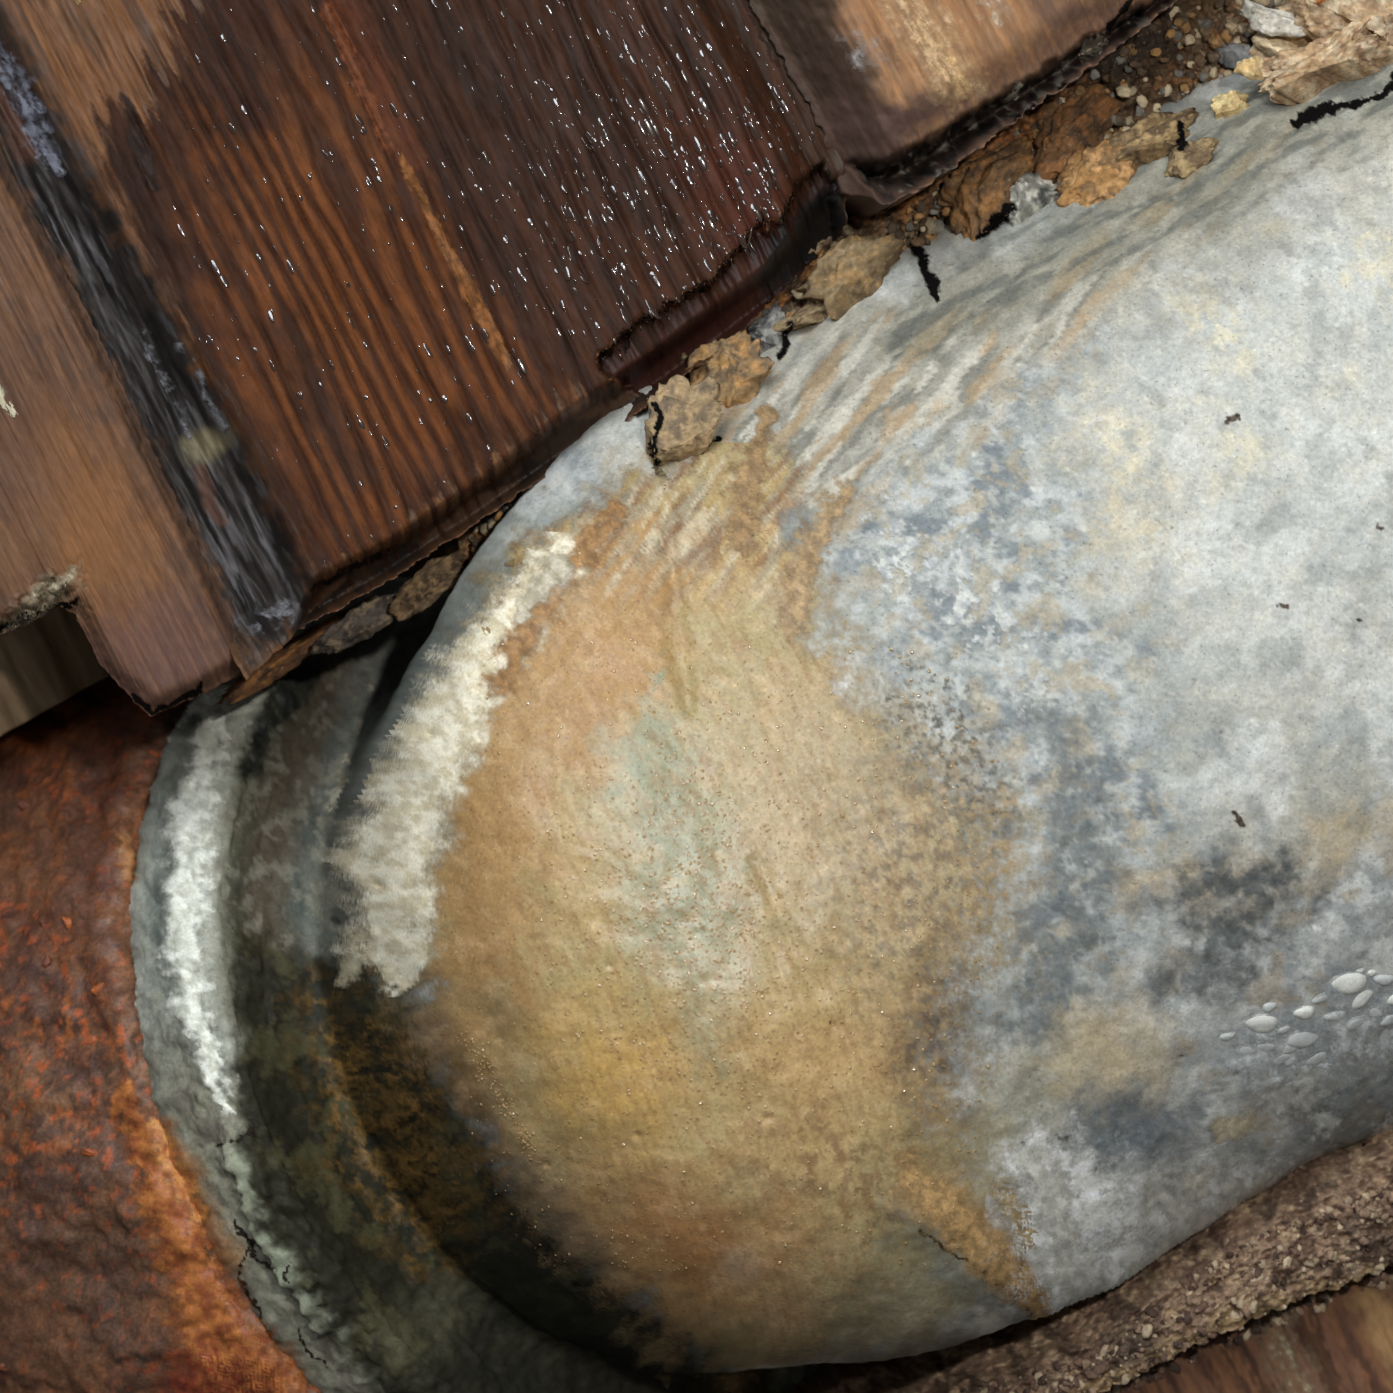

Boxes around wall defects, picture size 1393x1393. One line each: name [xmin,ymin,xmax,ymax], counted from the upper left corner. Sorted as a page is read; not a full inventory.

leakage [0,48,65,176]
peeling [1001,81,1023,103]
peeling [1057,31,1109,73]
spalling [1214,35,1299,81]
leakage [96,0,836,599]
leakage [252,601,294,630]
corrosion [114,832,136,883]
leakage [156,657,320,1116]
corrosion [369,404,1051,1393]
leakage [1152,847,1299,1004]
leakage [988,990,1393,1315]
corrosion [110,1079,301,1393]